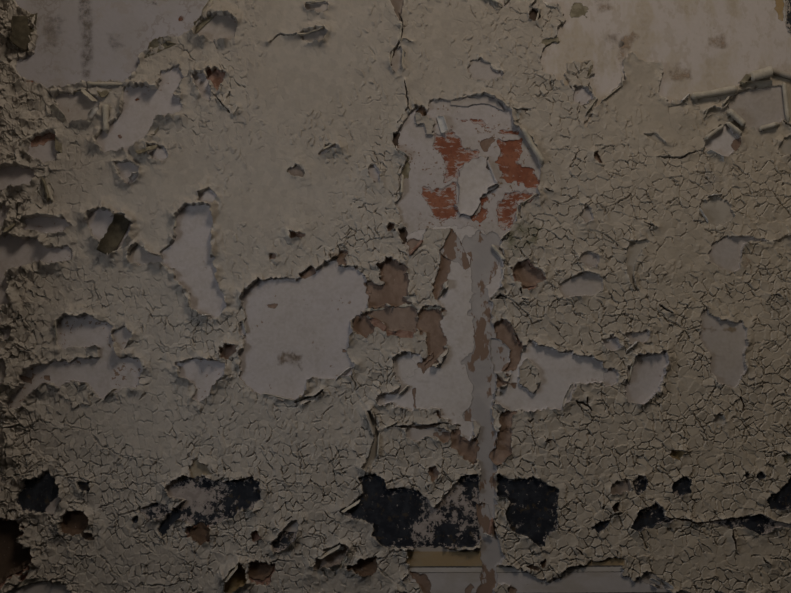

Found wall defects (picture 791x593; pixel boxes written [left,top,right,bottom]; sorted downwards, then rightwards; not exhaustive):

peeling [9,0,237,165]
peeling [492,0,791,162]
peeling [176,93,546,471]
peeling [708,235,791,273]
peeling [489,319,669,465]
flaking render [0,516,47,589]
crack [671,517,705,525]